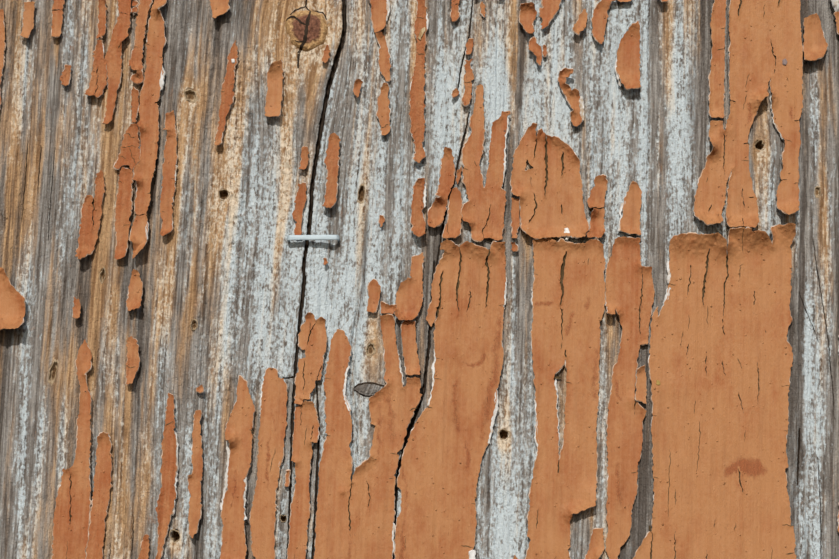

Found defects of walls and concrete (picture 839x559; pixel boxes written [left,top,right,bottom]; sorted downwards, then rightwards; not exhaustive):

peeling [0,267,26,330]
peeling [75,170,106,260]
peeling [85,0,178,260]
peeling [126,269,143,311]
peeling [210,0,230,19]
peeling [214,40,238,146]
crack [283,0,347,559]
crack [431,112,470,301]
crack [457,0,473,89]
peeling [220,0,828,559]
peeling [51,339,112,559]
crack [392,325,431,559]